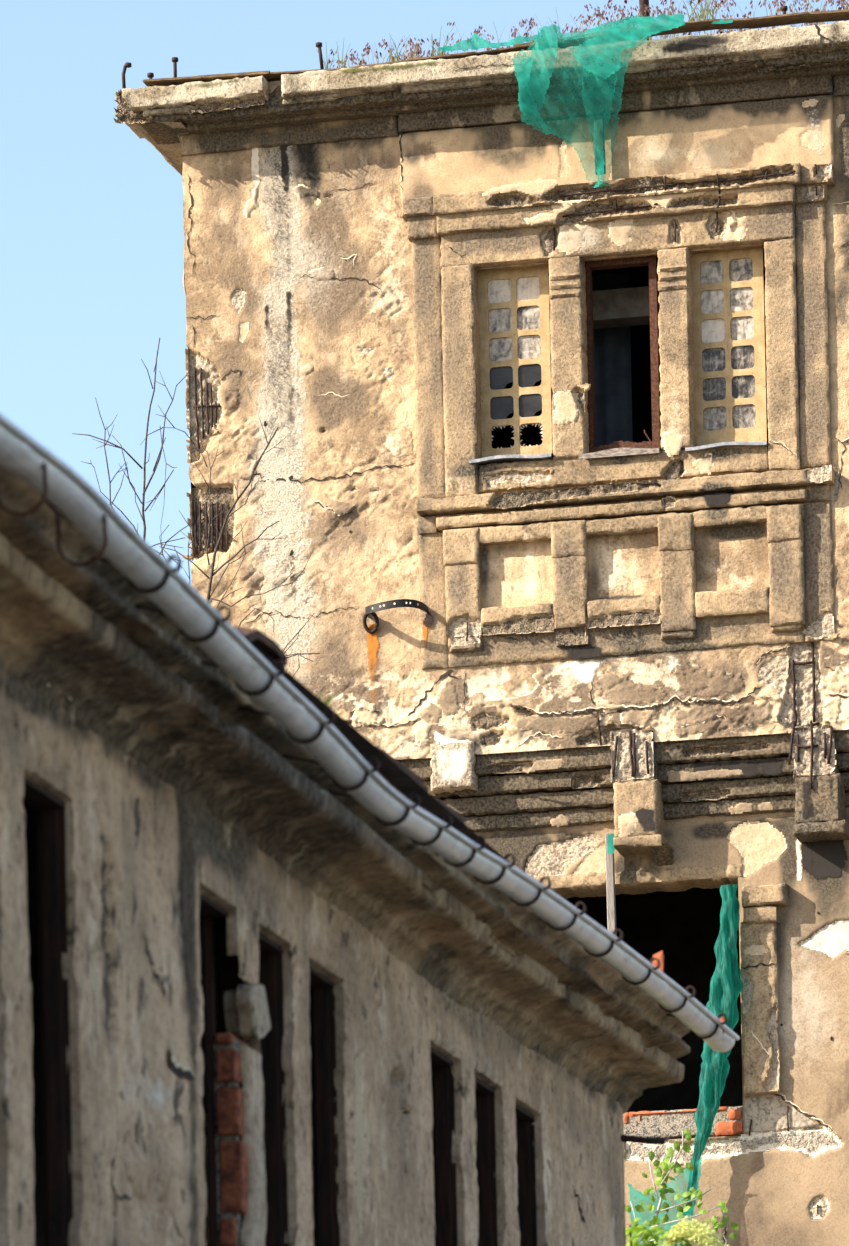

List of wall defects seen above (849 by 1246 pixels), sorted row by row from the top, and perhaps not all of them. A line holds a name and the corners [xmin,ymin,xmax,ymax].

spalling [482,141,796,255]
crack [298,254,380,289]
damp [251,146,317,664]
crack [836,438,849,490]
rust [367,624,379,679]
spalling [446,610,661,646]
peeling [412,669,553,746]
peeling [491,759,563,774]
spalling [572,607,849,877]
spalling [525,814,606,877]
spalling [799,920,849,958]
crack [774,1093,837,1135]